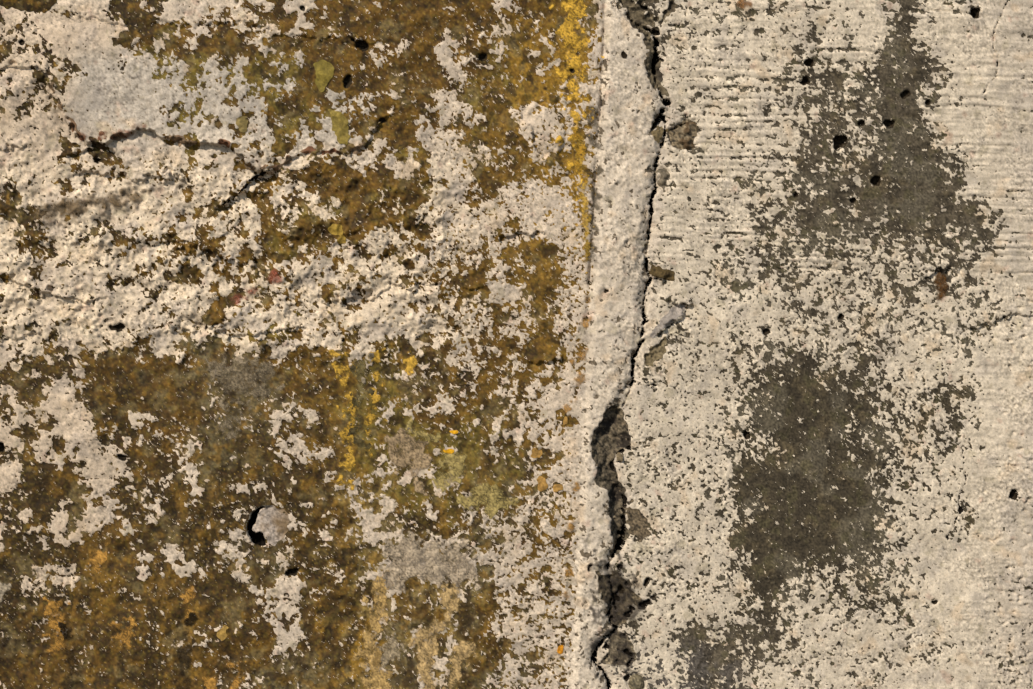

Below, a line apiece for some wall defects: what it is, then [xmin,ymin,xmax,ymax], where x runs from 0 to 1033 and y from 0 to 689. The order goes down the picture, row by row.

crack [222,169,273,205]
leakage [549,0,600,274]
crack [629,7,687,386]
leakage [402,351,418,375]
leakage [328,348,388,490]
leakage [384,416,519,519]
leakage [0,583,11,602]
leakage [43,597,79,689]
leakage [175,586,217,689]
leakage [353,529,484,689]
crack [591,608,618,689]
crack [606,531,625,569]